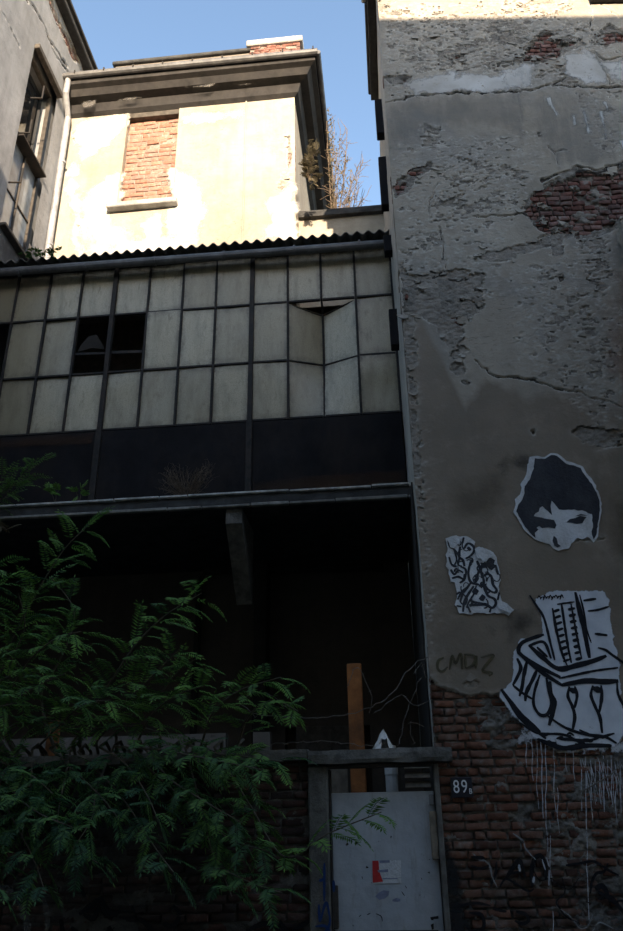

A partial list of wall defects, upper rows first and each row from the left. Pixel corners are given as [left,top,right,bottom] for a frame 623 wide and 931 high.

crack [26,0,67,70]
peeling [378,0,623,151]
crack [393,54,621,102]
peeling [63,114,208,257]
peeling [263,135,299,240]
spalling [390,124,623,425]
crack [480,366,581,393]